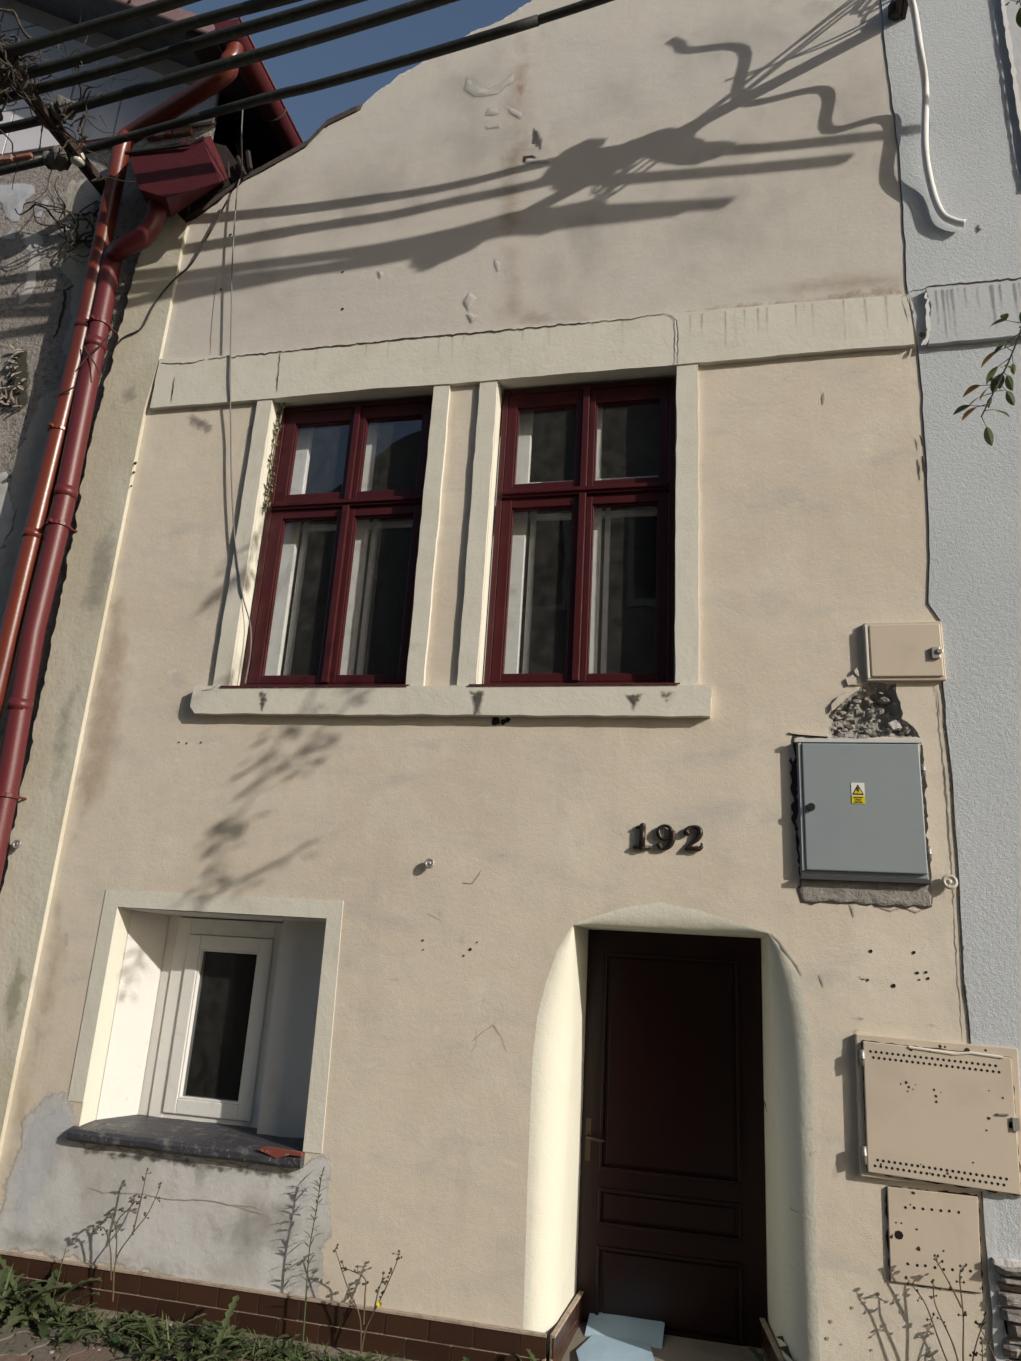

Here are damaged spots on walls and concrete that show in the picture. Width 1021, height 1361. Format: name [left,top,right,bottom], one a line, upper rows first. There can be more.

peeling [0,178,102,365]
crack [52,285,74,338]
peeling [0,344,59,627]
spalling [789,668,932,880]
peeling [0,1092,332,1298]